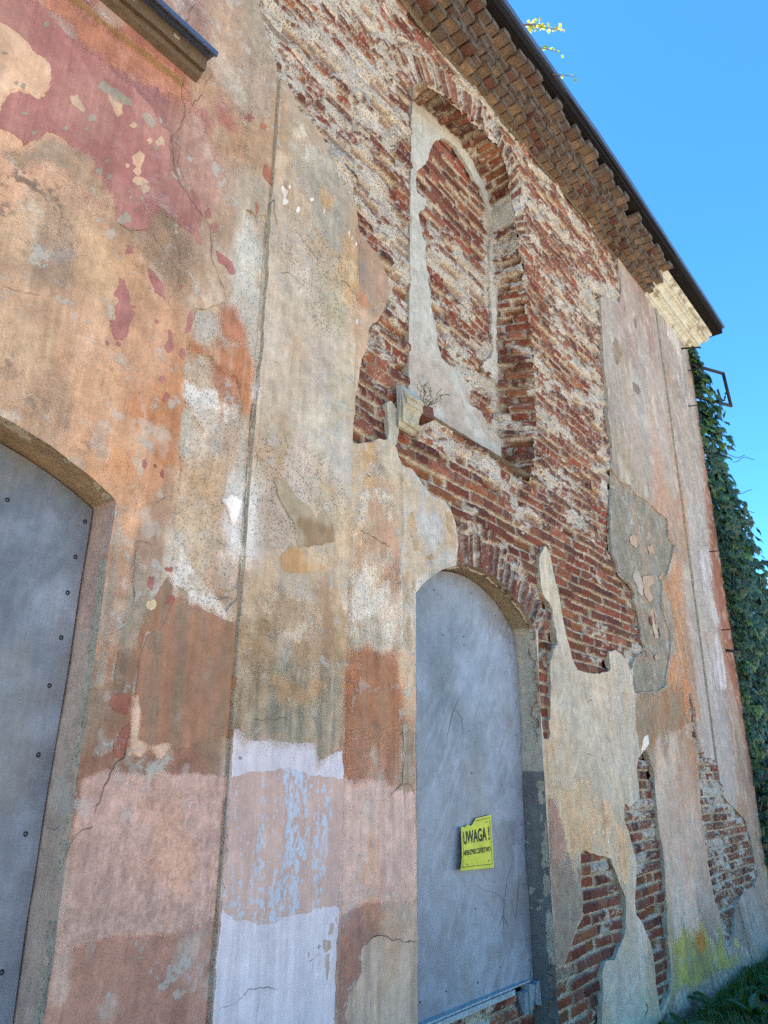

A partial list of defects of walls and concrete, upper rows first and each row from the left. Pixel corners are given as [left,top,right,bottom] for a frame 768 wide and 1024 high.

peeling [0,0,218,245]
flaking render [259,0,673,740]
crack [45,742,127,854]
flaking render [450,755,669,1024]
flaking render [689,694,758,946]